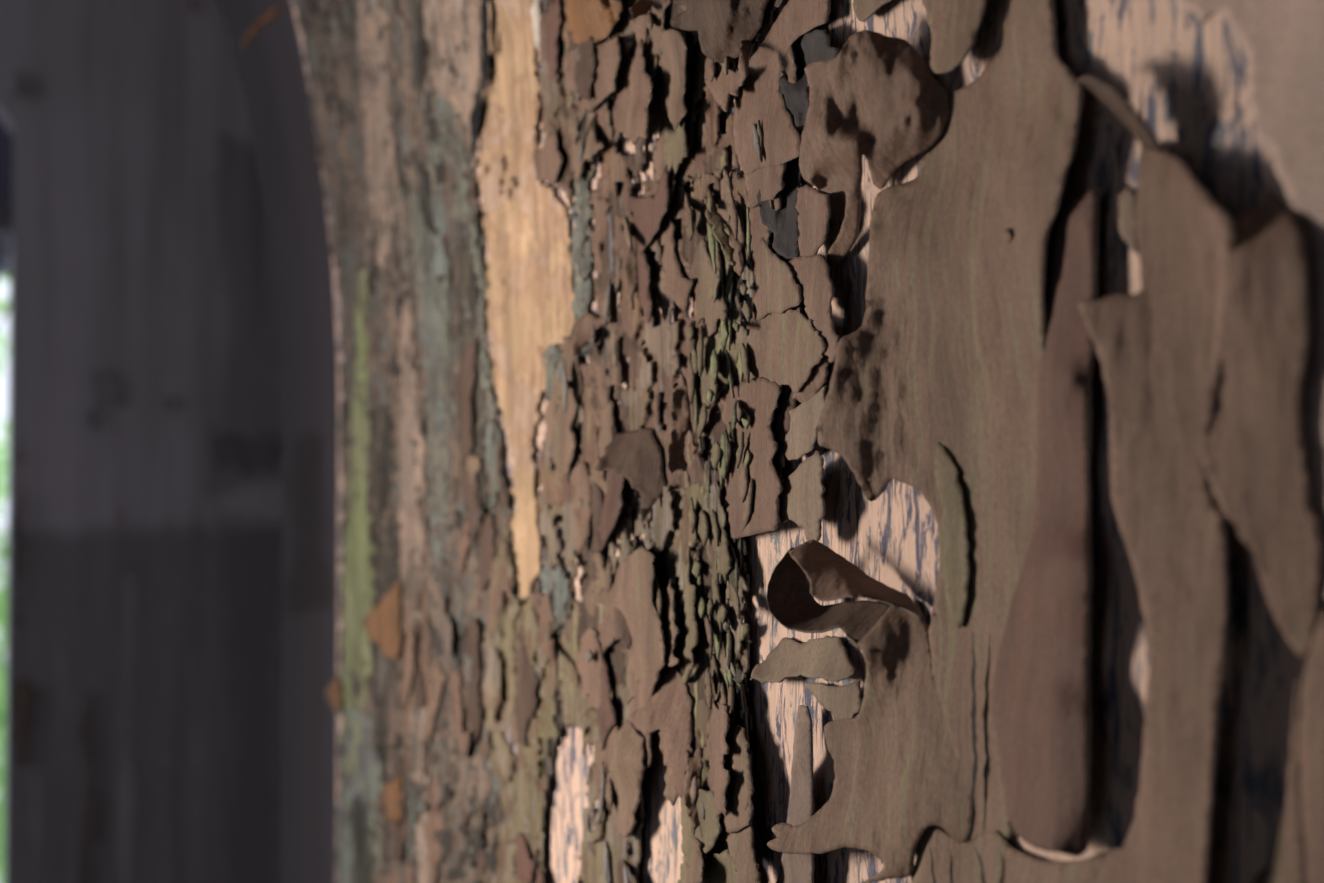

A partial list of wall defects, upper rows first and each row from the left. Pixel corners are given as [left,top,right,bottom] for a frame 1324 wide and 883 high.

peeling [293,0,1324,883]